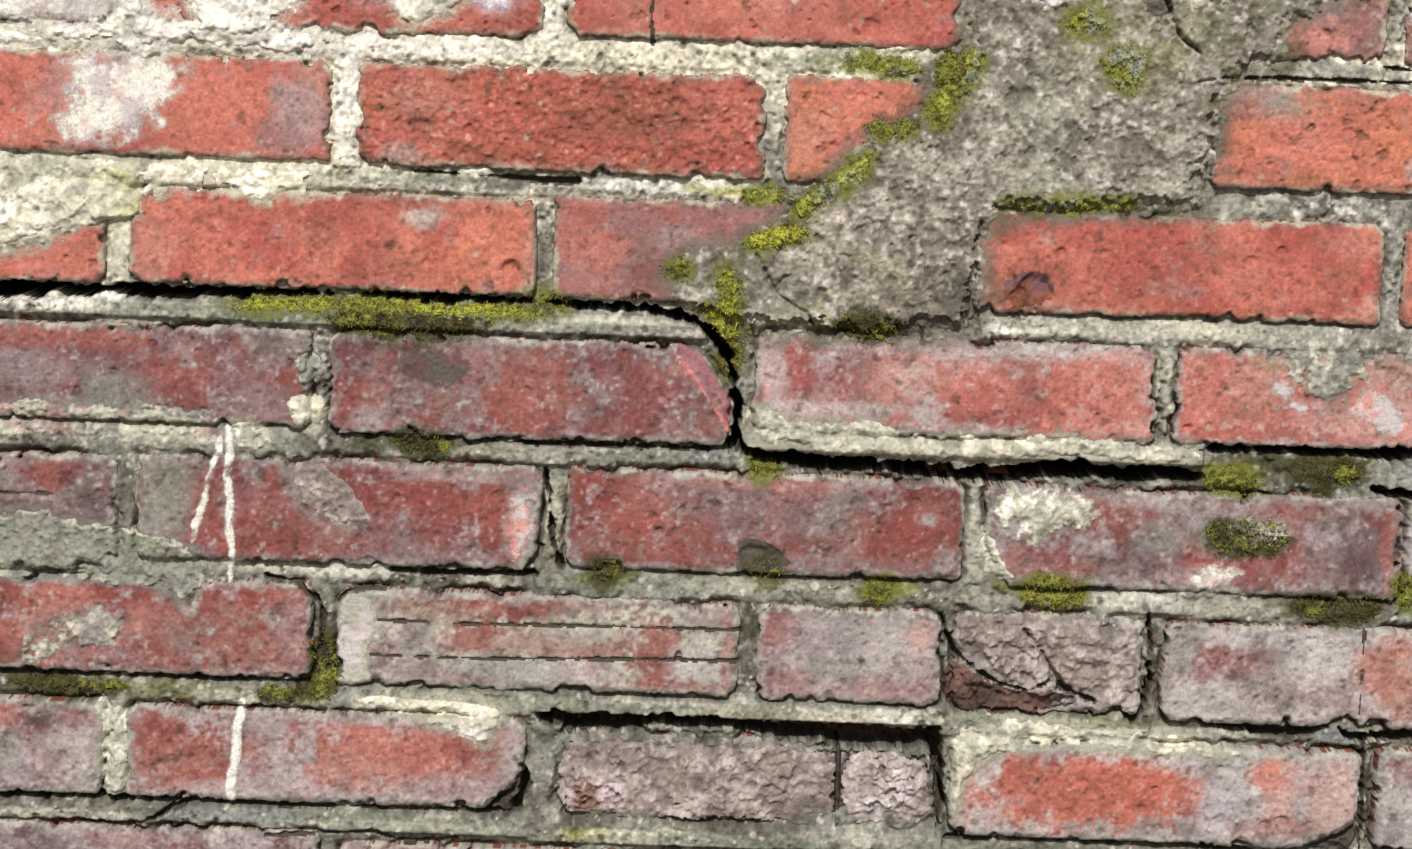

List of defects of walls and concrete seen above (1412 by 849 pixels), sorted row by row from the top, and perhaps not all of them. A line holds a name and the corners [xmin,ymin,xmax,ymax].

crack [648,0,656,46]
water stain [56,42,188,149]
crack [0,278,1412,684]
water stain [1190,564,1243,592]
crack [938,612,1154,725]
crack [536,707,1252,849]
crack [1206,628,1412,849]